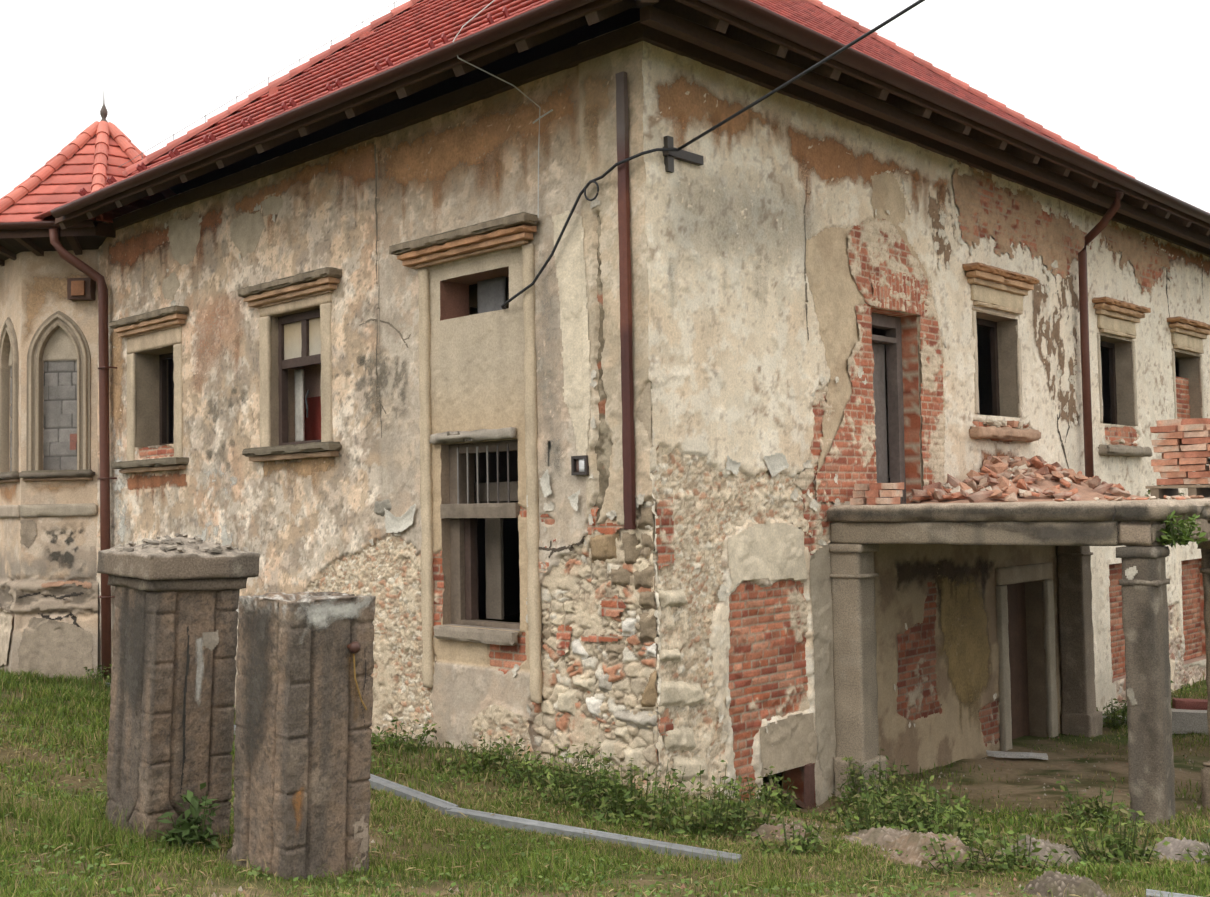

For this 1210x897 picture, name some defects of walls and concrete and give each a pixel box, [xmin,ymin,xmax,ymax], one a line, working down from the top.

flaking render [489,159,1174,803]
spalling [20,520,37,548]
peeling [115,533,249,553]
spalling [41,580,92,589]
spalling [304,499,445,739]
spalling [202,630,219,651]